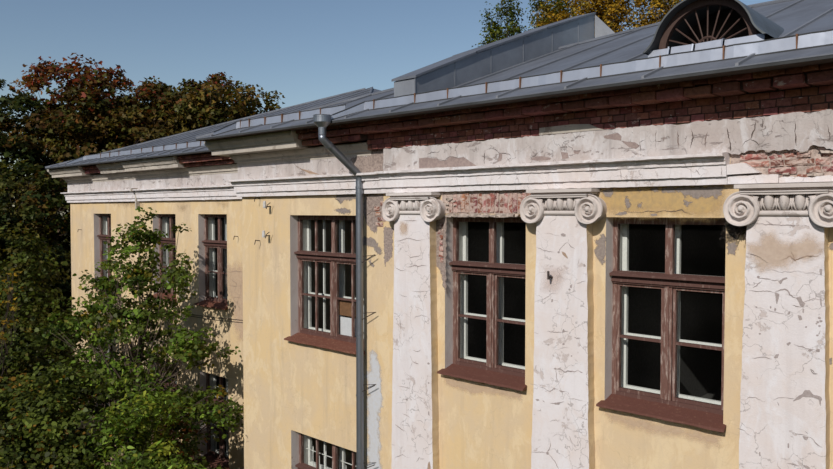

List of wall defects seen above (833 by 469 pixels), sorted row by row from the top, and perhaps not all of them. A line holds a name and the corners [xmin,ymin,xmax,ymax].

crack [639,132,707,150]
crack [721,121,763,174]
flaking render [730,145,833,179]
flaking render [336,194,393,267]
crack [394,220,425,271]
flaking render [436,190,531,294]
crack [749,252,822,320]
crack [532,233,585,421]
crack [746,342,822,406]
crack [777,431,819,469]